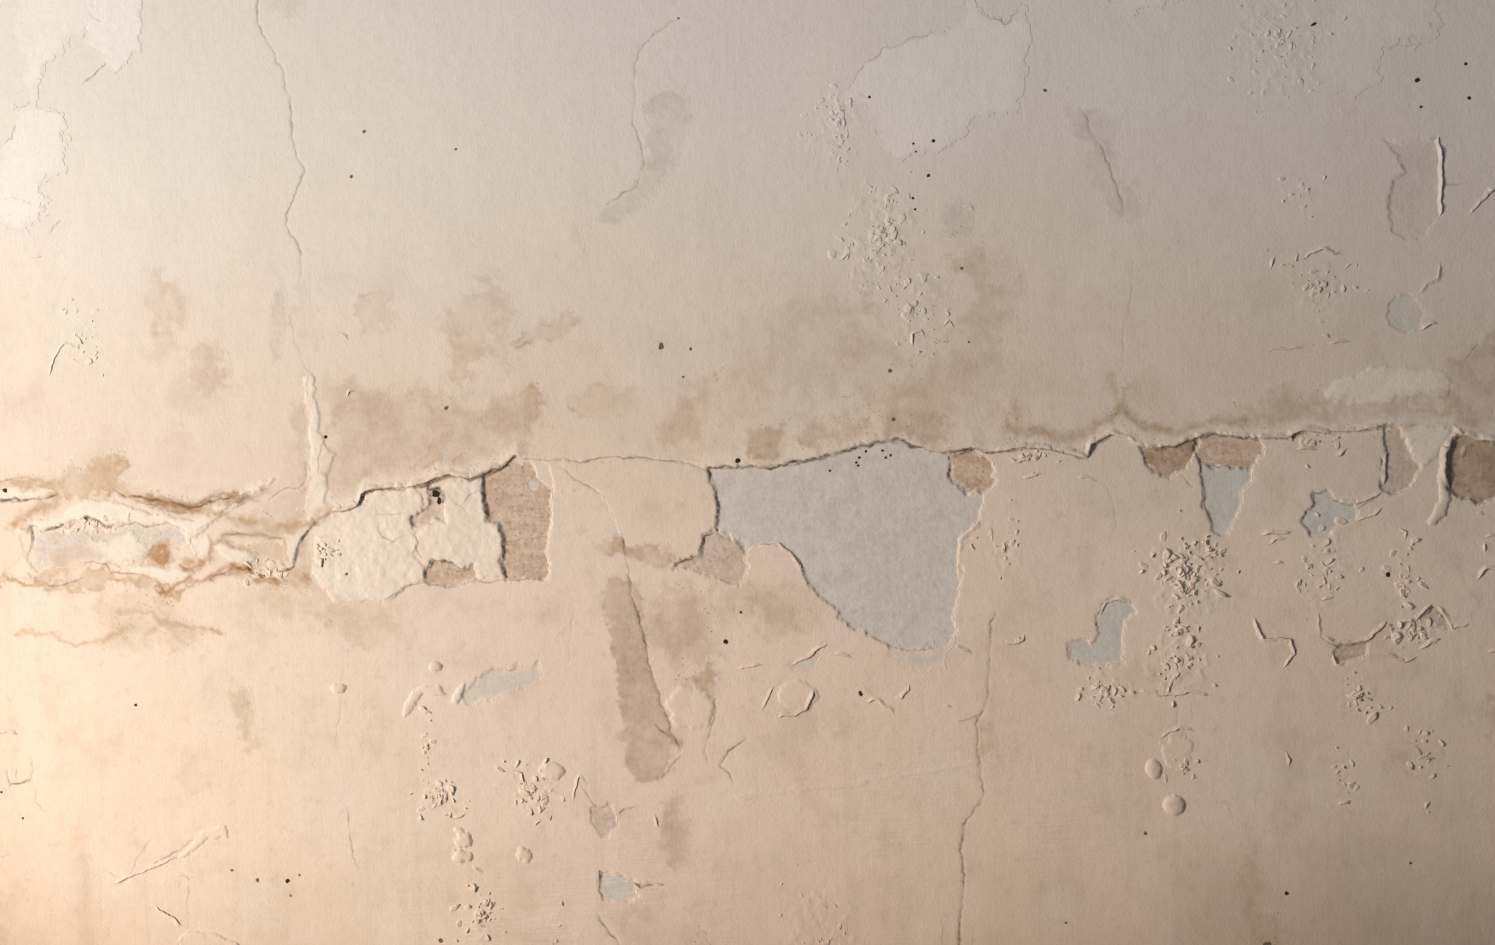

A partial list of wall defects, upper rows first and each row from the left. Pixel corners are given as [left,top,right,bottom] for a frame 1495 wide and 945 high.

flaking render [28,512,190,572]
peeling [244,558,290,586]
water stain [0,195,1495,660]
flaking render [308,417,1470,725]
flaking render [1439,426,1495,515]
water stain [589,534,822,945]